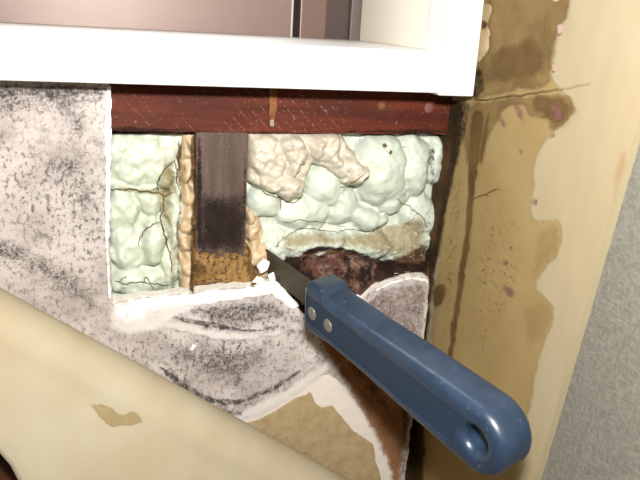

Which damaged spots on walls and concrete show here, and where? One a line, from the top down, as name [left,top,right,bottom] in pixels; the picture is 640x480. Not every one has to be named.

mould [0,83,106,137]
crack [475,82,589,100]
mould [30,144,101,244]
water stain [282,0,576,416]
mould [0,237,113,322]
mould [173,299,287,332]
mould [156,331,272,391]
mould [162,367,301,416]